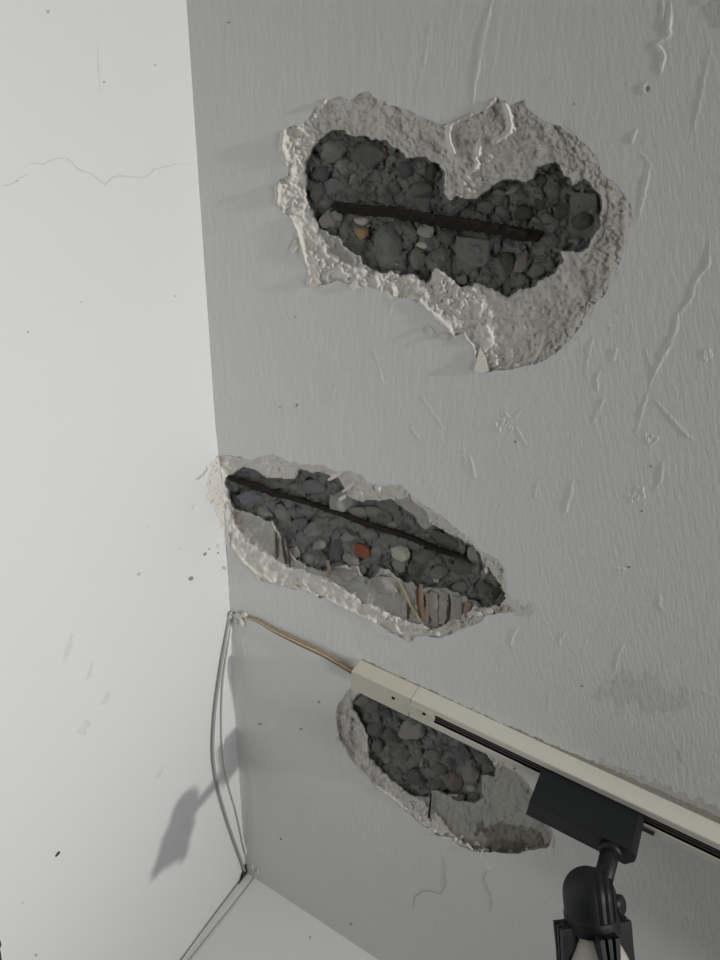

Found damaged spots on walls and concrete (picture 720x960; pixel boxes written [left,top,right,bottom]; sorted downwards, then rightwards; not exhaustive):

crack [1,157,178,186]
spalling [273,92,633,373]
spalling [195,454,524,642]
spalling [336,688,554,857]